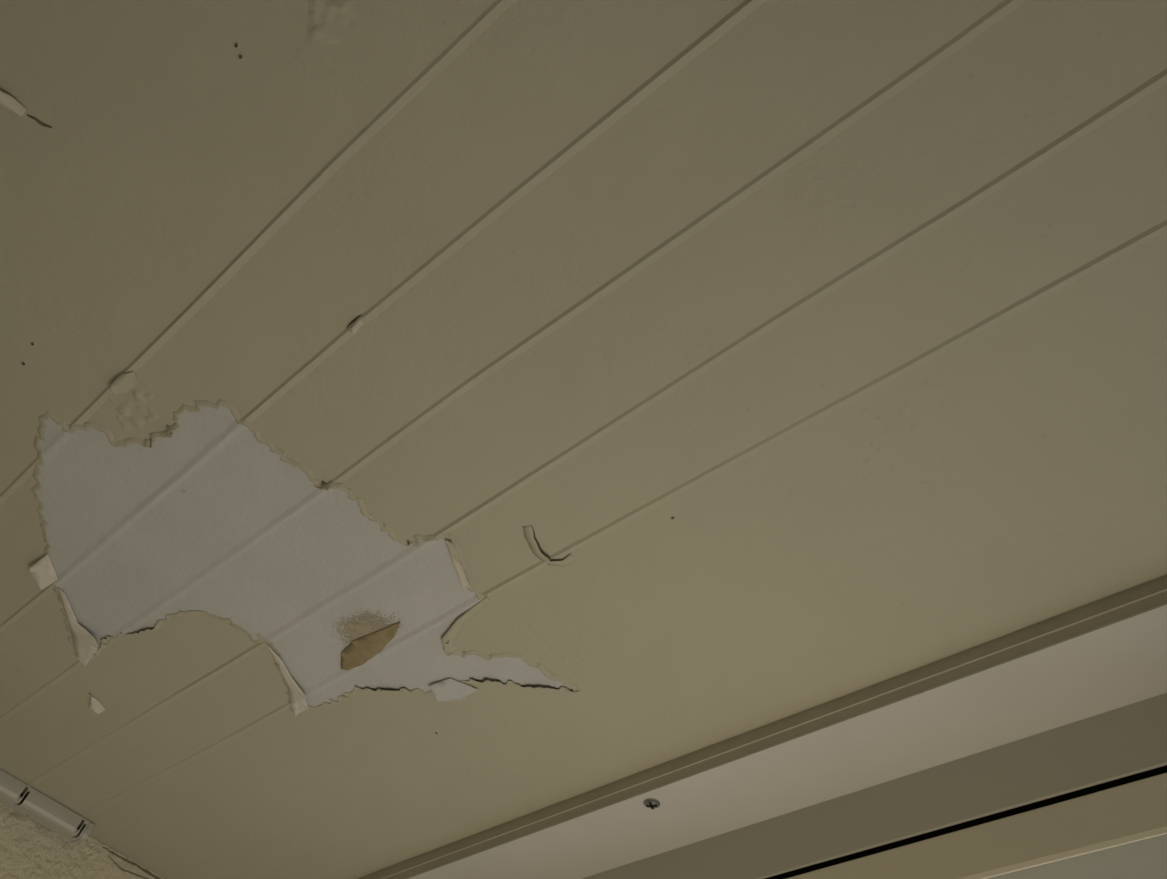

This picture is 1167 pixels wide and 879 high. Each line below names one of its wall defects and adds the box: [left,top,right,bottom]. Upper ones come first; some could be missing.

peeling [0,91,52,128]
peeling [29,400,581,717]